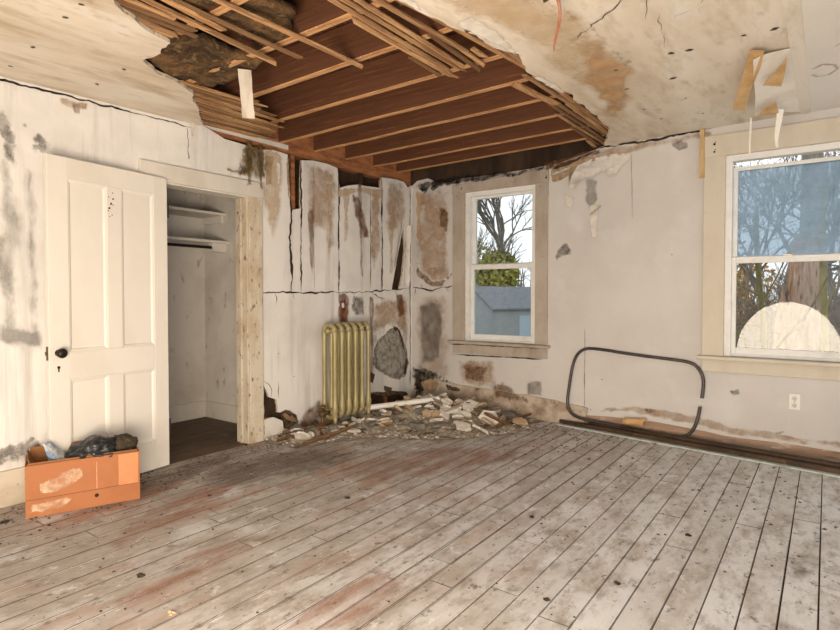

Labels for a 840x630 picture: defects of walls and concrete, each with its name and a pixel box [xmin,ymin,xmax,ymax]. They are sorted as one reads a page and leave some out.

peeling [459,17,516,53]
crack [572,0,621,41]
crack [0,79,191,156]
leakage [308,168,335,241]
leakage [344,183,403,258]
peeling [551,152,632,238]
crack [263,154,451,379]
leakage [1,329,40,345]
spalling [264,397,298,436]
spalling [370,326,409,405]
leakage [413,303,460,397]
leakage [462,362,518,399]